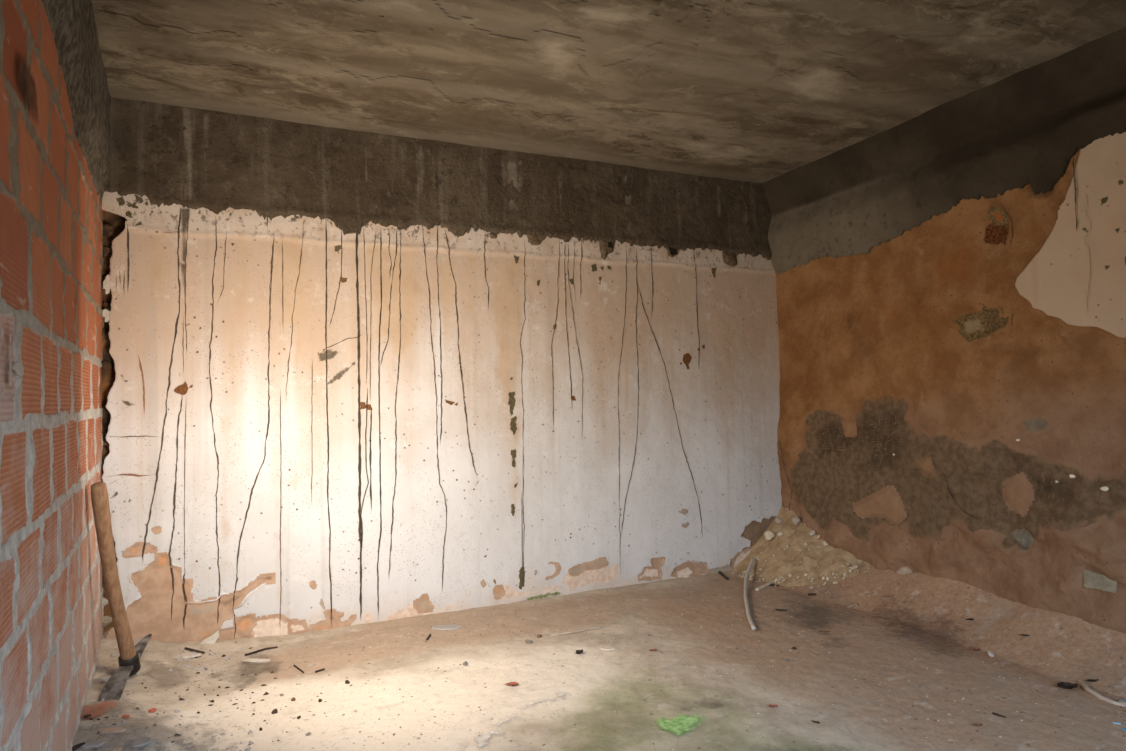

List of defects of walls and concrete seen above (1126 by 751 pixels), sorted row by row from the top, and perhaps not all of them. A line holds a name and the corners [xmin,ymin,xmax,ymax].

spalling [102,571,116,639]
spalling [101,208,127,475]
crack [111,208,304,638]
peeling [113,526,474,658]
crack [324,227,477,588]
crack [519,241,527,583]
peeling [481,554,623,604]
crack [551,240,583,427]
spalling [599,240,616,260]
crack [618,250,703,574]
peeling [638,514,776,581]
damp [785,391,1126,555]